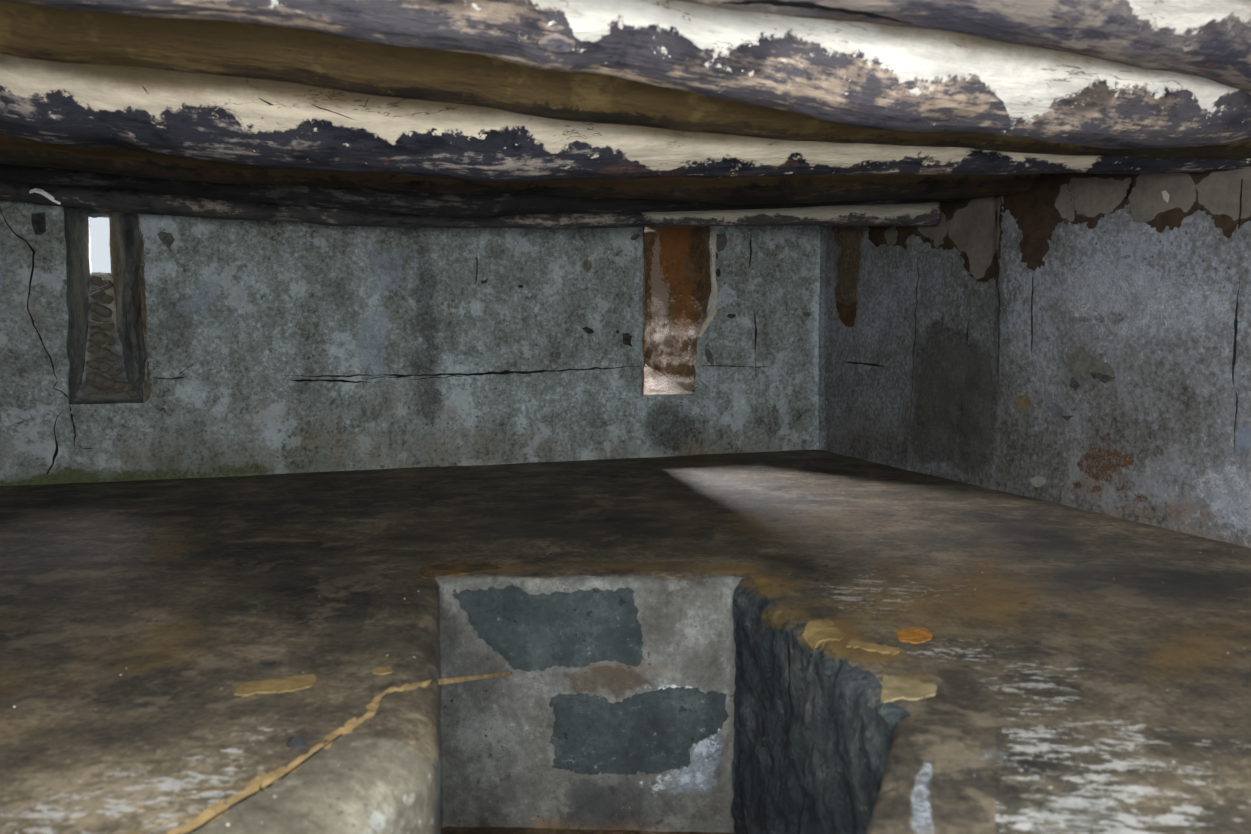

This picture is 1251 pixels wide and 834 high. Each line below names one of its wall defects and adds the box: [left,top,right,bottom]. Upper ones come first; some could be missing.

flaking render [868,167,1251,282]
crack [0,206,93,475]
crack [291,366,636,383]
corrosion [1073,433,1149,502]
crack [118,672,513,834]
spalling [339,561,996,834]